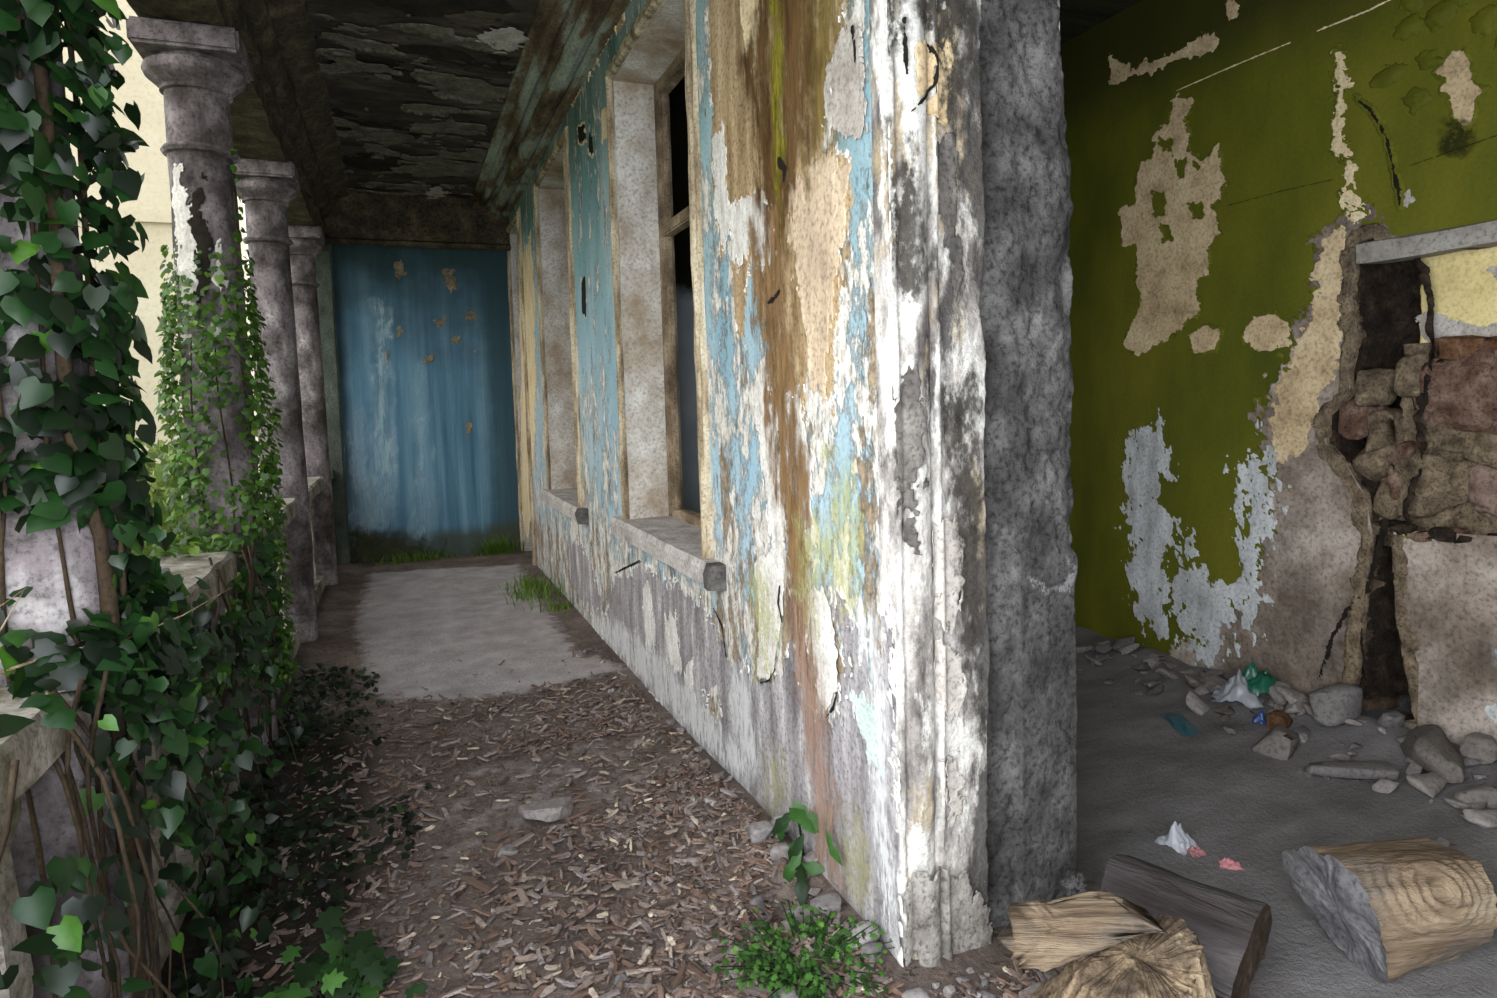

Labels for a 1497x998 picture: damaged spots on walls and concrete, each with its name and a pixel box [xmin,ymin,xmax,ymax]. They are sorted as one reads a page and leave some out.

water stain [886,0,980,136]
peeling [1108,32,1219,85]
peeling [1225,0,1240,21]
peeling [1431,47,1491,132]
peeling [171,163,229,355]
water stain [888,124,928,302]
peeling [564,0,993,968]
water stain [939,368,990,745]
peeling [1114,92,1497,745]
crack [1319,519,1389,679]
water stain [594,615,785,815]
water stain [843,596,899,951]